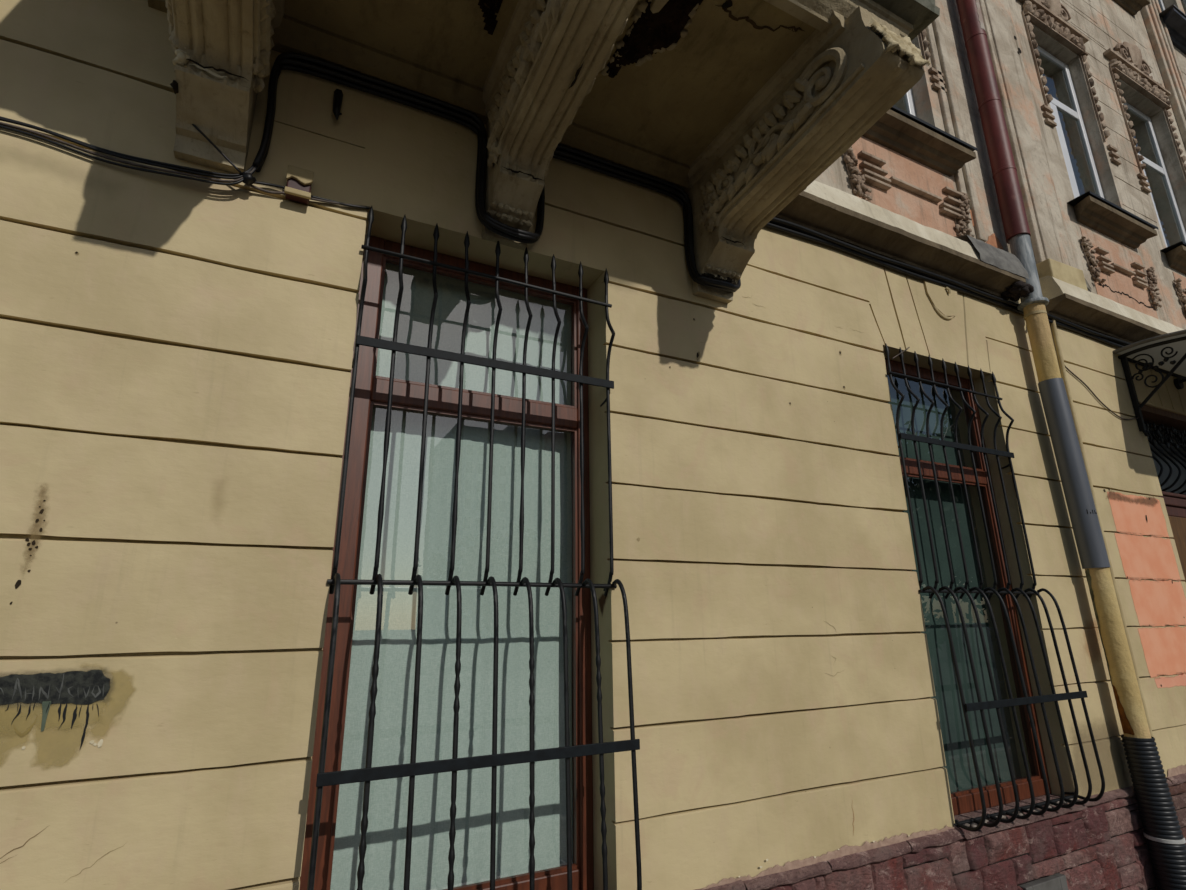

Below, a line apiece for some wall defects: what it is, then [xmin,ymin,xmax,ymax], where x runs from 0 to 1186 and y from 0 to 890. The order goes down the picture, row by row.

flaking render [478,0,503,35]
crack [716,0,804,32]
flaking render [600,0,703,76]
crack [0,825,50,863]